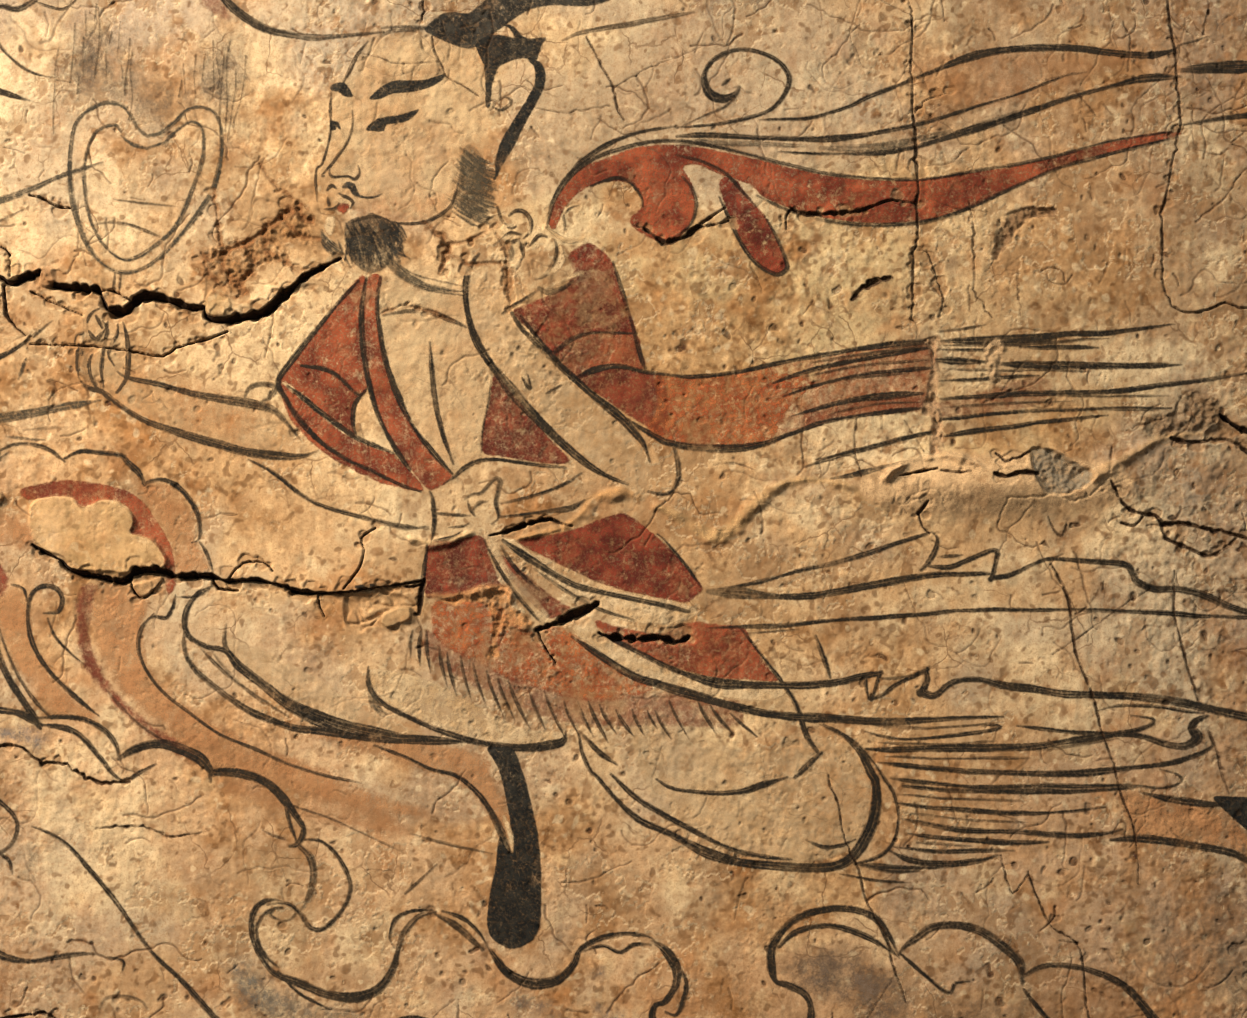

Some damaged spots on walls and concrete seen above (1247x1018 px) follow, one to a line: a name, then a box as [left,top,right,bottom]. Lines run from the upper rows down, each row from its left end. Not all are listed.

crack [384,3,478,96]
crack [1160,4,1245,314]
crack [0,164,342,346]
flaking render [1032,448,1092,493]
crack [1170,414,1247,454]
crack [32,534,426,616]
crack [535,601,690,663]
crack [1052,480,1247,884]